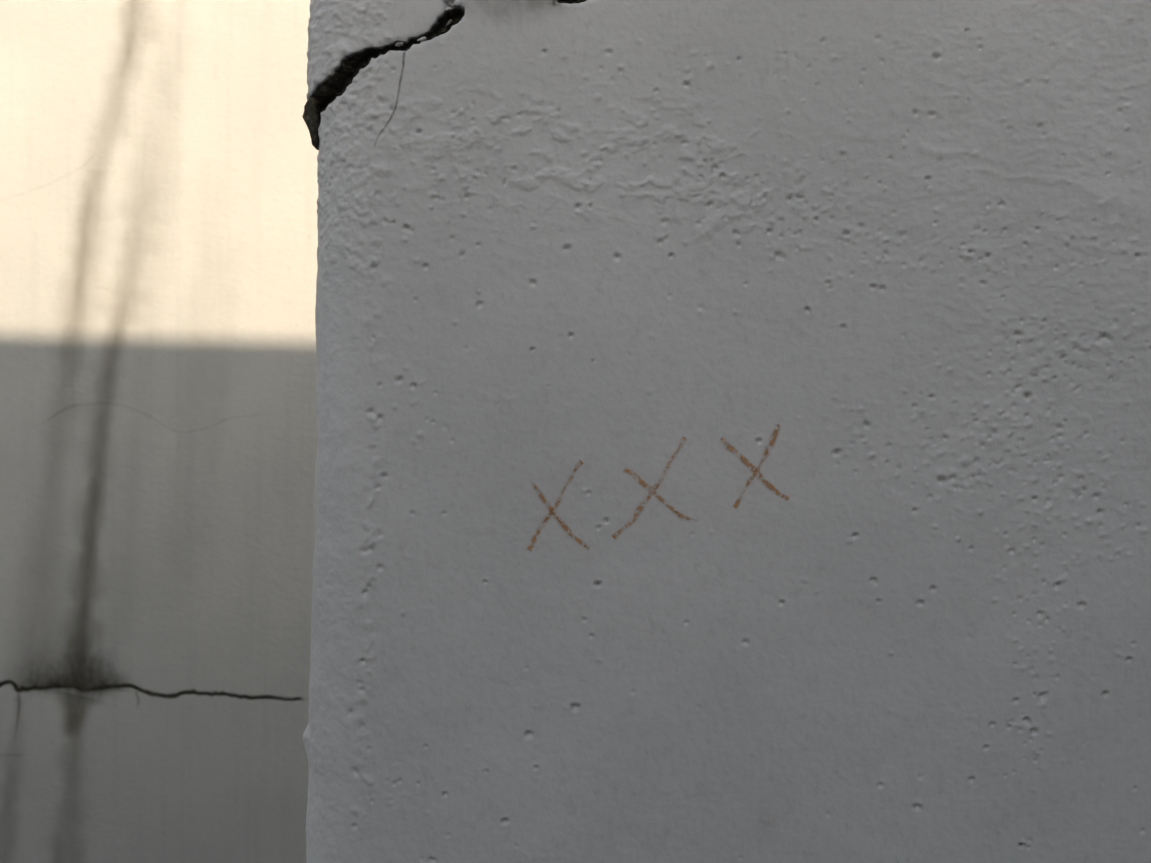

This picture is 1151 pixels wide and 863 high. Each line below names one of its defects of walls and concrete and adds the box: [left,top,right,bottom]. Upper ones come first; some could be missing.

crack [559,0,586,8]
crack [302,8,463,150]
crack [0,681,301,701]